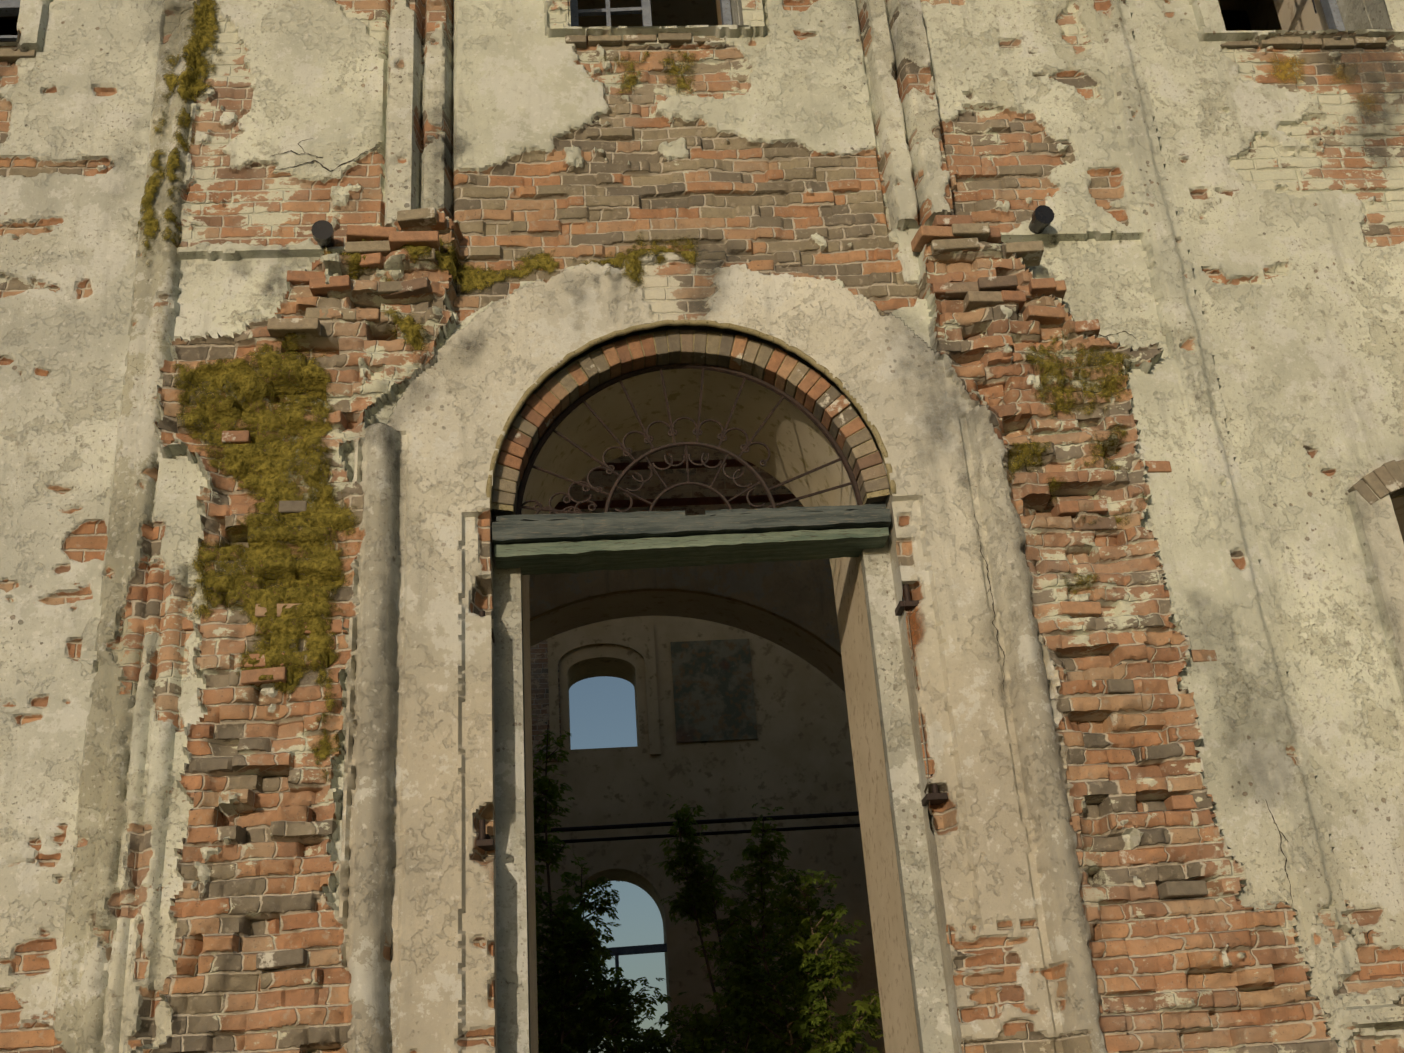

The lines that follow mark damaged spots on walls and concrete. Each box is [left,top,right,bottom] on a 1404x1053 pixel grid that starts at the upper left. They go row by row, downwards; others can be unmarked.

flaking render [998,0,1114,100]
flaking render [0,29,118,177]
flaking render [1190,29,1404,248]
flaking render [0,216,65,241]
flaking render [0,272,93,300]
flaking render [104,0,931,1053]
flaking render [911,103,1344,1053]
flaking render [64,637,83,662]
flaking render [5,694,70,727]
flaking render [0,927,70,1053]
flaking render [1334,908,1404,997]
flaking render [1346,1032,1402,1053]